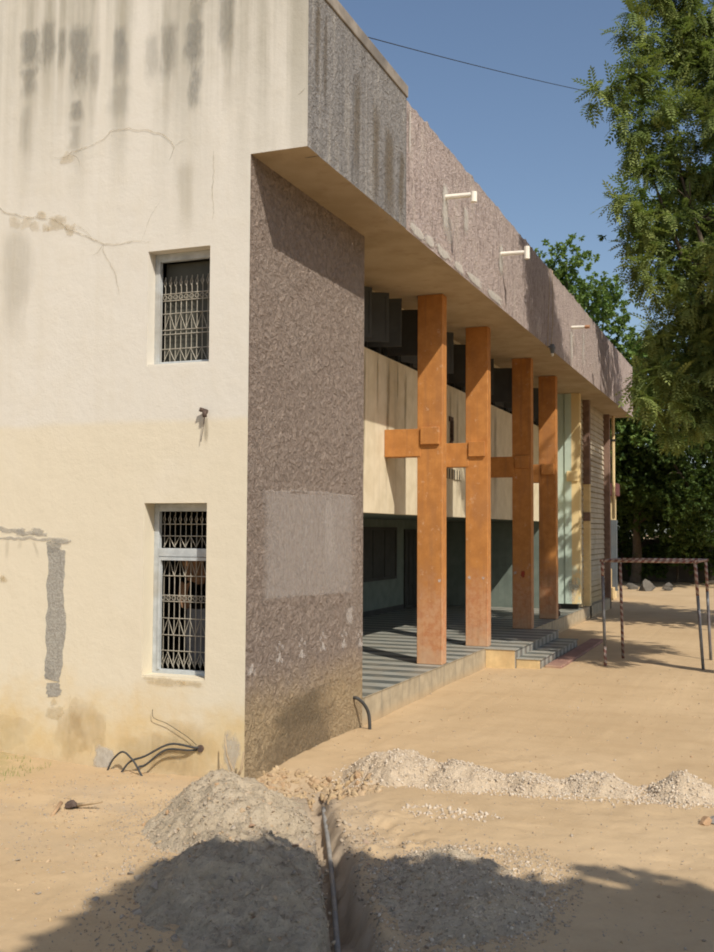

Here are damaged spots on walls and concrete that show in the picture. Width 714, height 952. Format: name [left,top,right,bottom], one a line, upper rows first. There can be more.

damp [24,29,51,59]
spalling [0,527,71,553]
peeling [45,667,62,697]